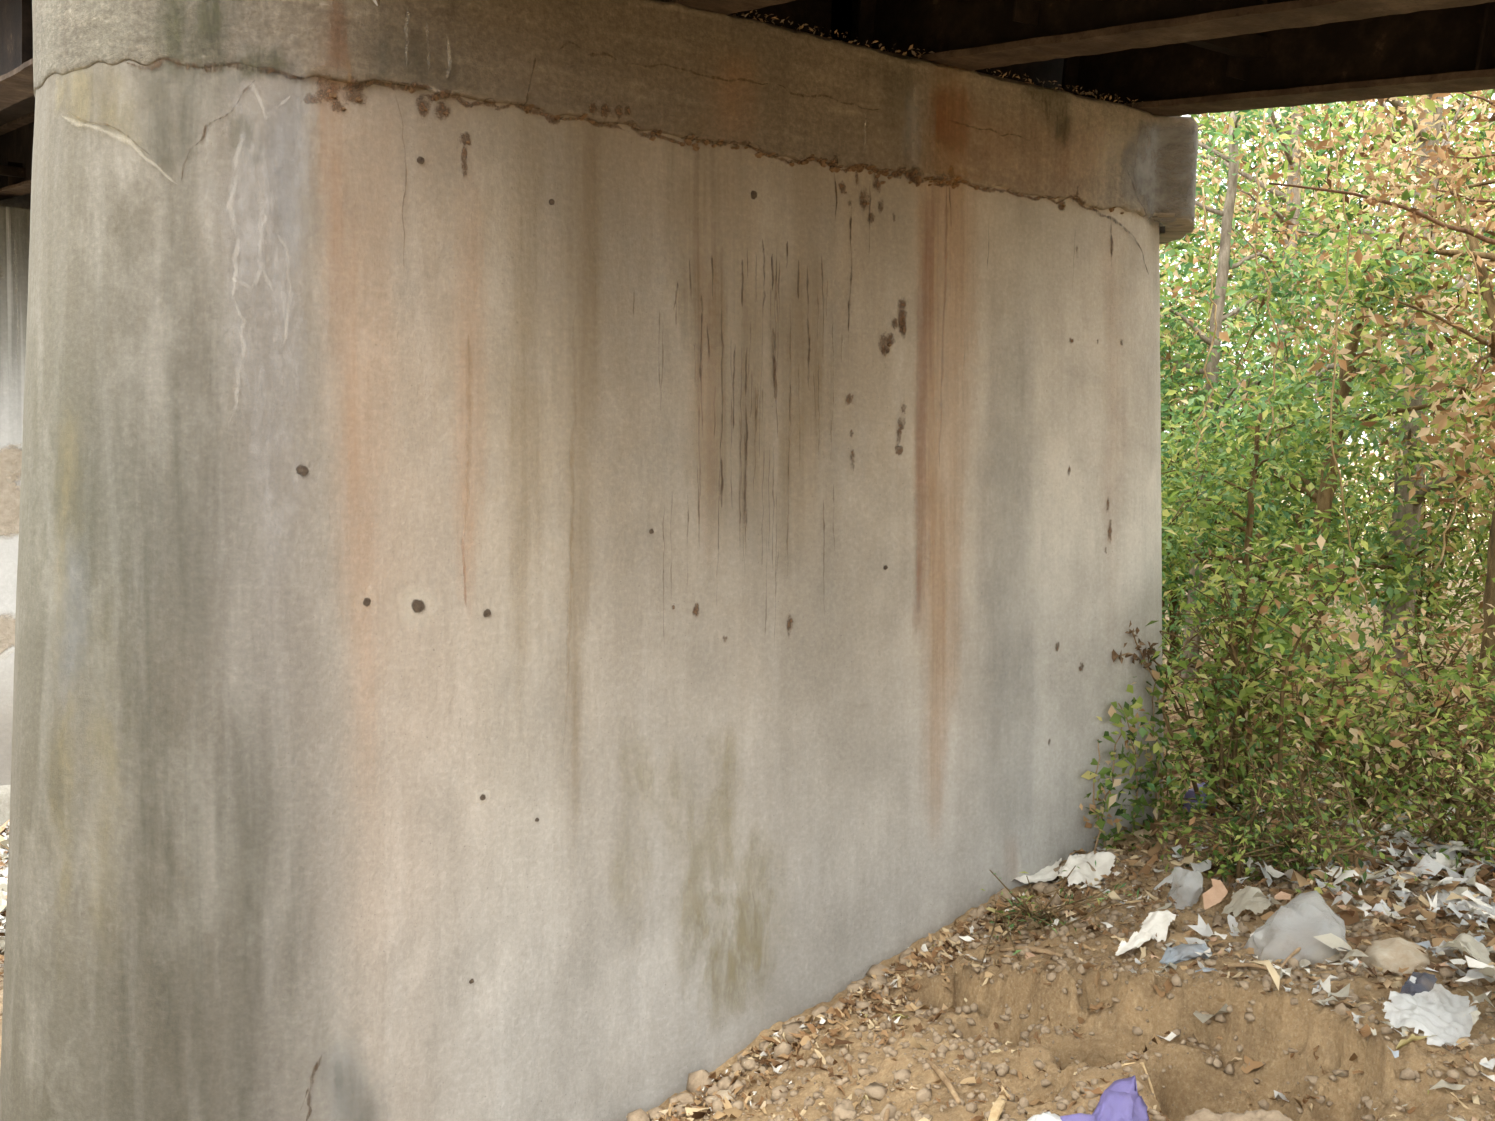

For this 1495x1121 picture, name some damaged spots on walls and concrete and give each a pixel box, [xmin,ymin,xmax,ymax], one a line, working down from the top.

crack [127,57,305,180]
crack [352,46,1148,272]
water stain [762,239,852,437]
flaking render [0,445,22,536]
water stain [699,313,789,547]
flaking render [0,615,16,653]
crack [306,1062,320,1121]